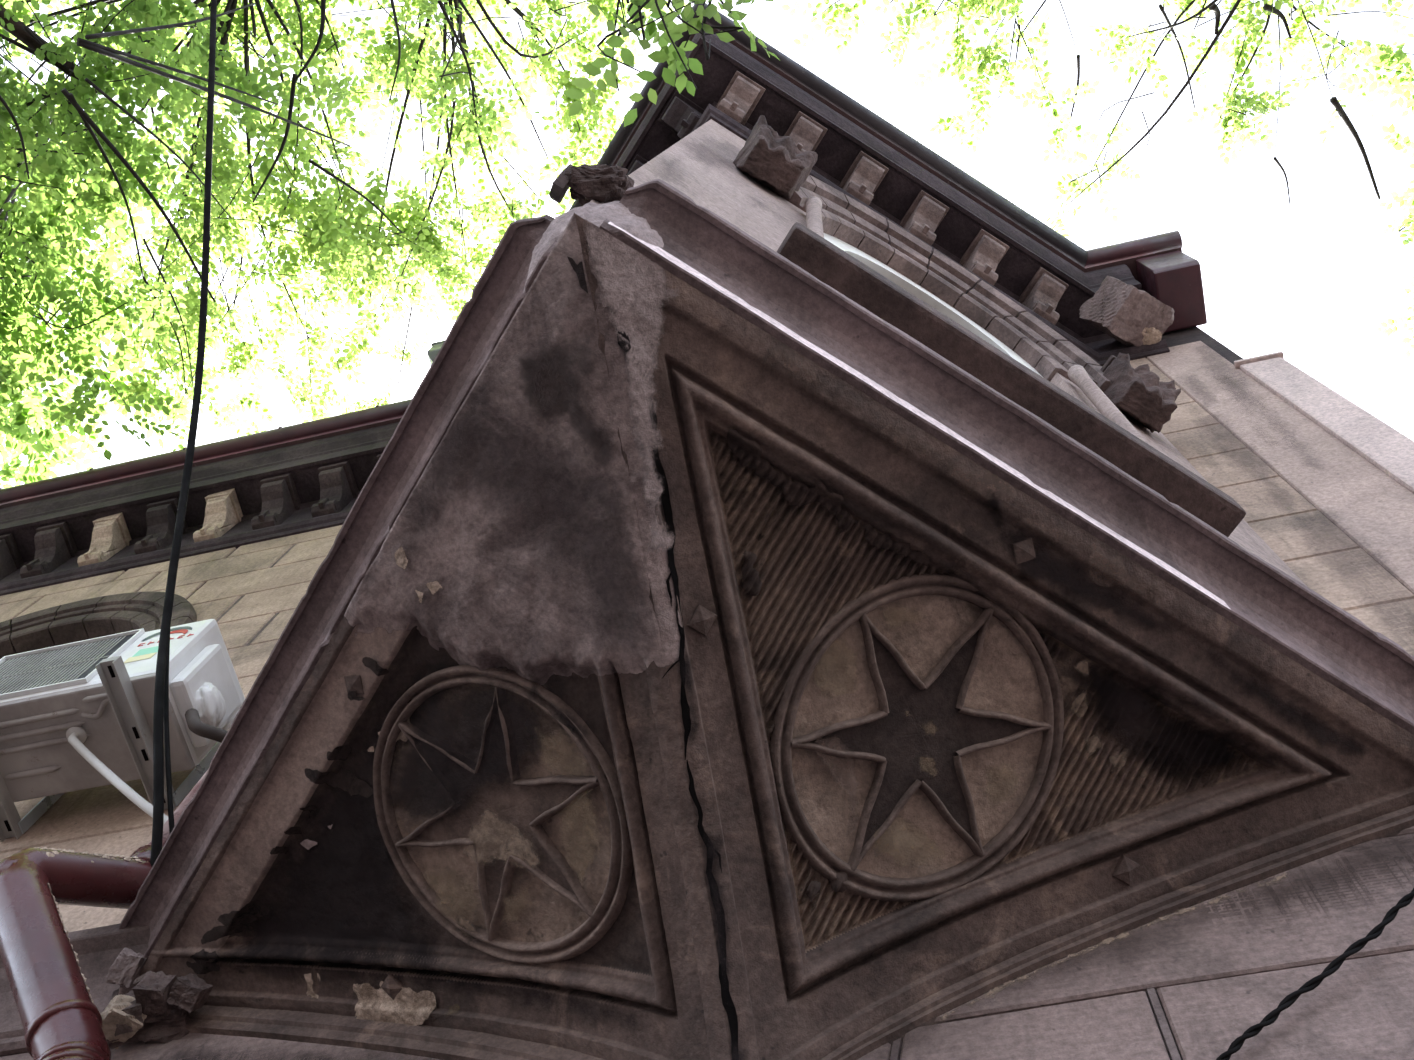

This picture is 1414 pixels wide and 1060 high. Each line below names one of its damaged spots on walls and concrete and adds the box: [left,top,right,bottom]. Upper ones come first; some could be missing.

spalling [1079,276,1175,346]
spalling [524,164,675,549]
leakage [523,345,611,461]
leakage [437,389,627,624]
peeling [362,657,388,676]
peeling [304,717,410,798]
crack [649,402,738,1054]
peeling [270,805,317,854]
spalling [101,900,269,1049]
spalling [304,973,320,999]
spalling [353,981,458,1026]